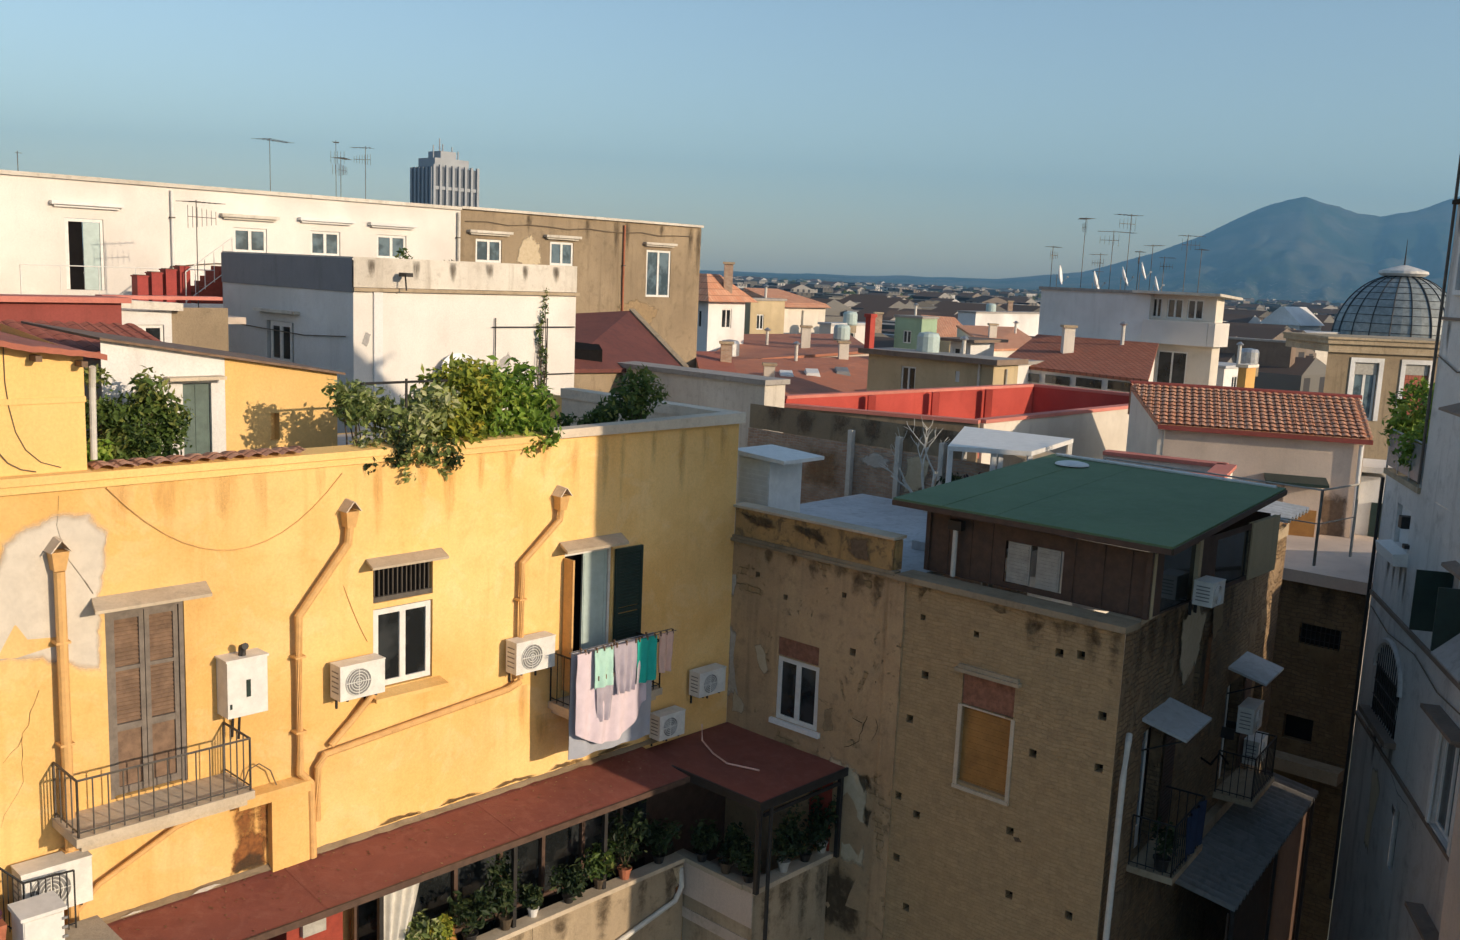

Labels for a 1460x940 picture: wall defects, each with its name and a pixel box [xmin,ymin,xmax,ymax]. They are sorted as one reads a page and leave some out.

water stain [743,513,774,528]
water stain [795,526,824,544]
peeling [0,515,106,668]